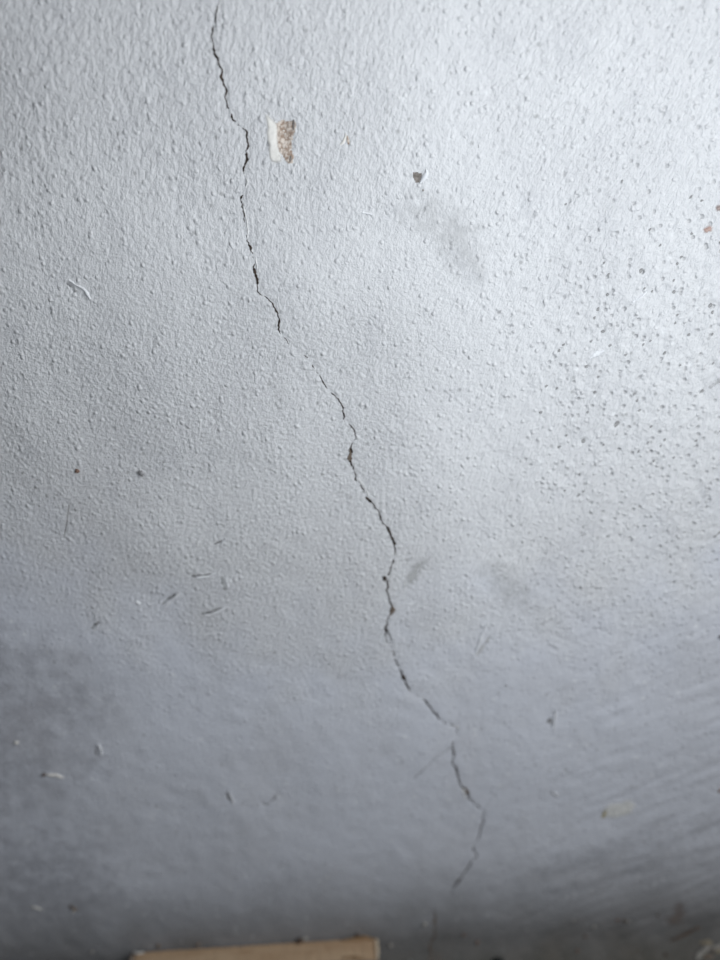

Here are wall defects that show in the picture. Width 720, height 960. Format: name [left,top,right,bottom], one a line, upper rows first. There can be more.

crack [211,0,484,889]